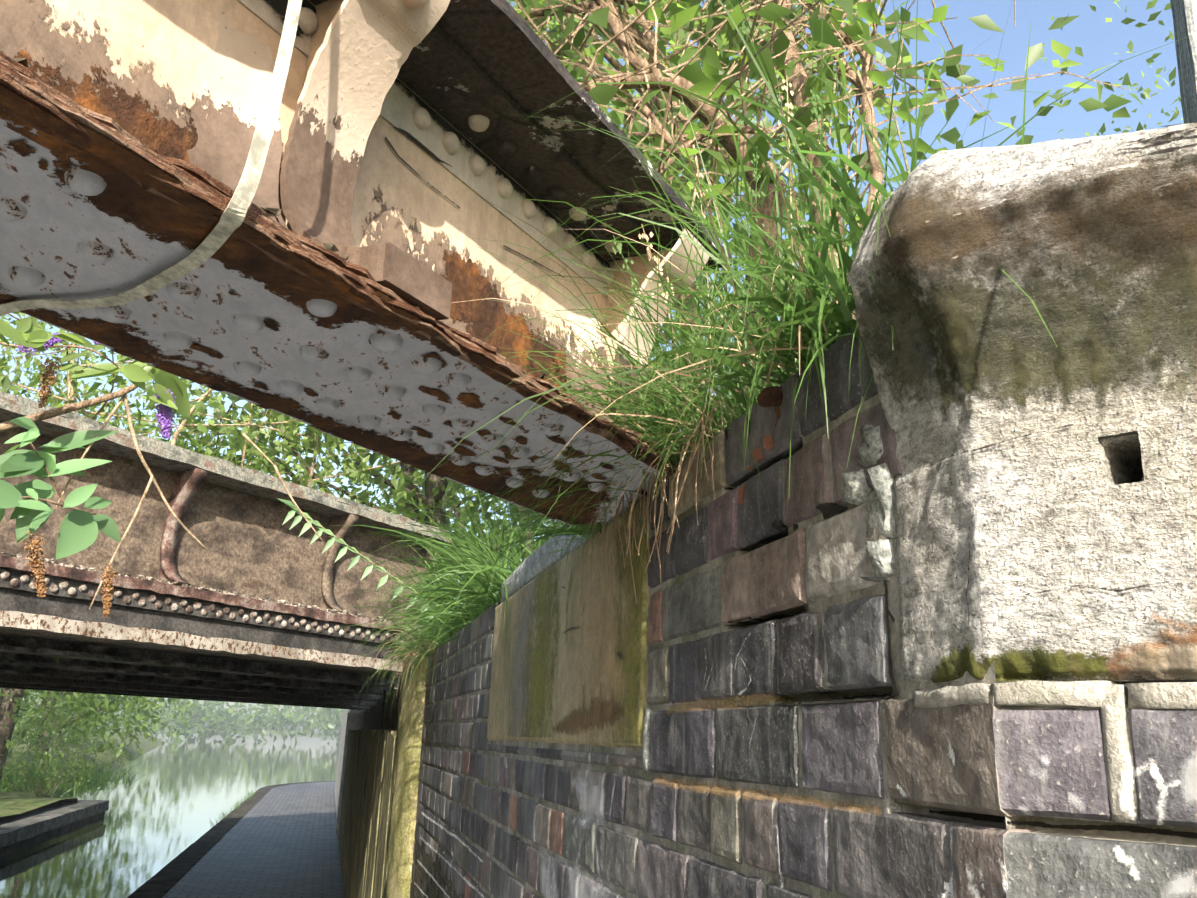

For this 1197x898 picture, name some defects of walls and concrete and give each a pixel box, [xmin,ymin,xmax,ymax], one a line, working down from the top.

peeling [0,0,194,132]
corrosion [0,48,234,250]
peeling [278,143,286,224]
water stain [873,167,1197,289]
corrosion [0,202,679,525]
water stain [925,307,983,417]
crack [930,424,1074,473]
corrosion [1105,615,1197,680]
water stain [557,685,623,734]
water stain [1118,763,1181,828]